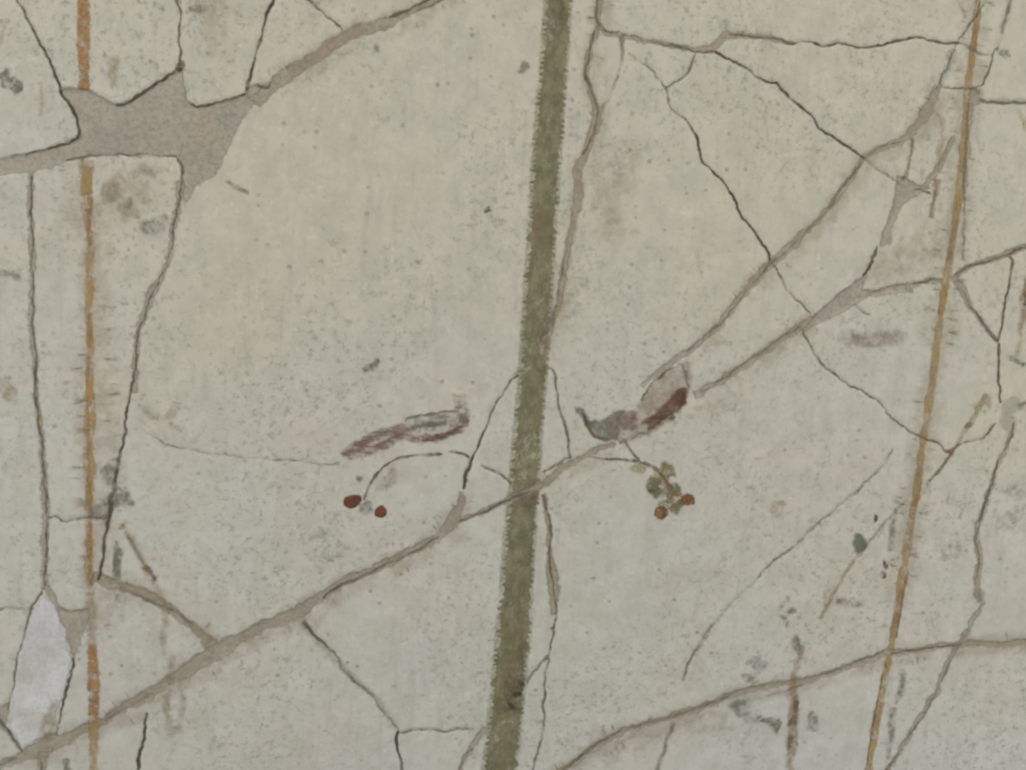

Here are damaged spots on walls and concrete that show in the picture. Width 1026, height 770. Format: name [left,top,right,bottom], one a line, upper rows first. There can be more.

crack [191,0,274,107]
crack [389,0,442,17]
crack [584,0,1026,278]
crack [0,0,185,770]
crack [787,238,1023,770]
crack [323,563,387,598]
crack [460,367,571,770]
crack [303,621,356,683]
crack [684,625,713,677]
crack [395,727,488,770]